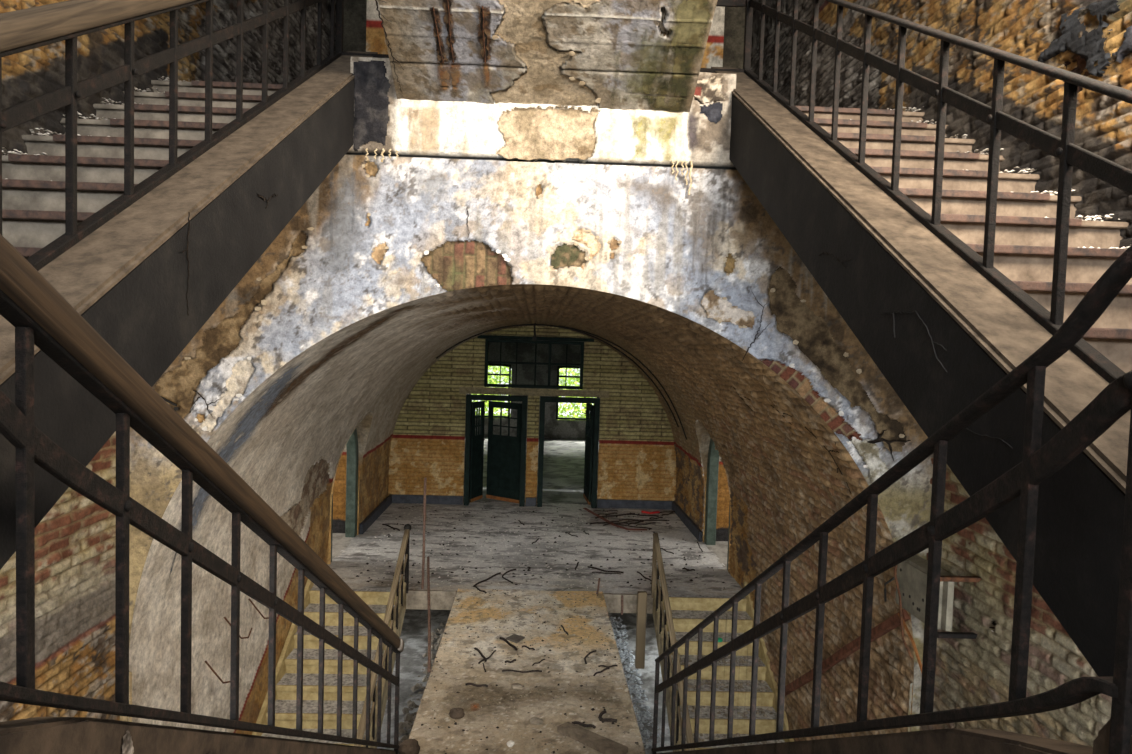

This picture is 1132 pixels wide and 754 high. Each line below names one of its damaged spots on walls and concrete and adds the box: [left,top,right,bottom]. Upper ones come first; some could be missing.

rust [430,0,461,90]
rust [477,5,491,87]
peeling [491,0,601,161]
spalling [1061,56,1090,93]
water stain [328,180,357,268]
spalling [421,240,513,291]
spalling [549,228,622,270]
water stain [619,114,717,270]
flaking render [760,266,907,482]
crack [881,310,947,372]